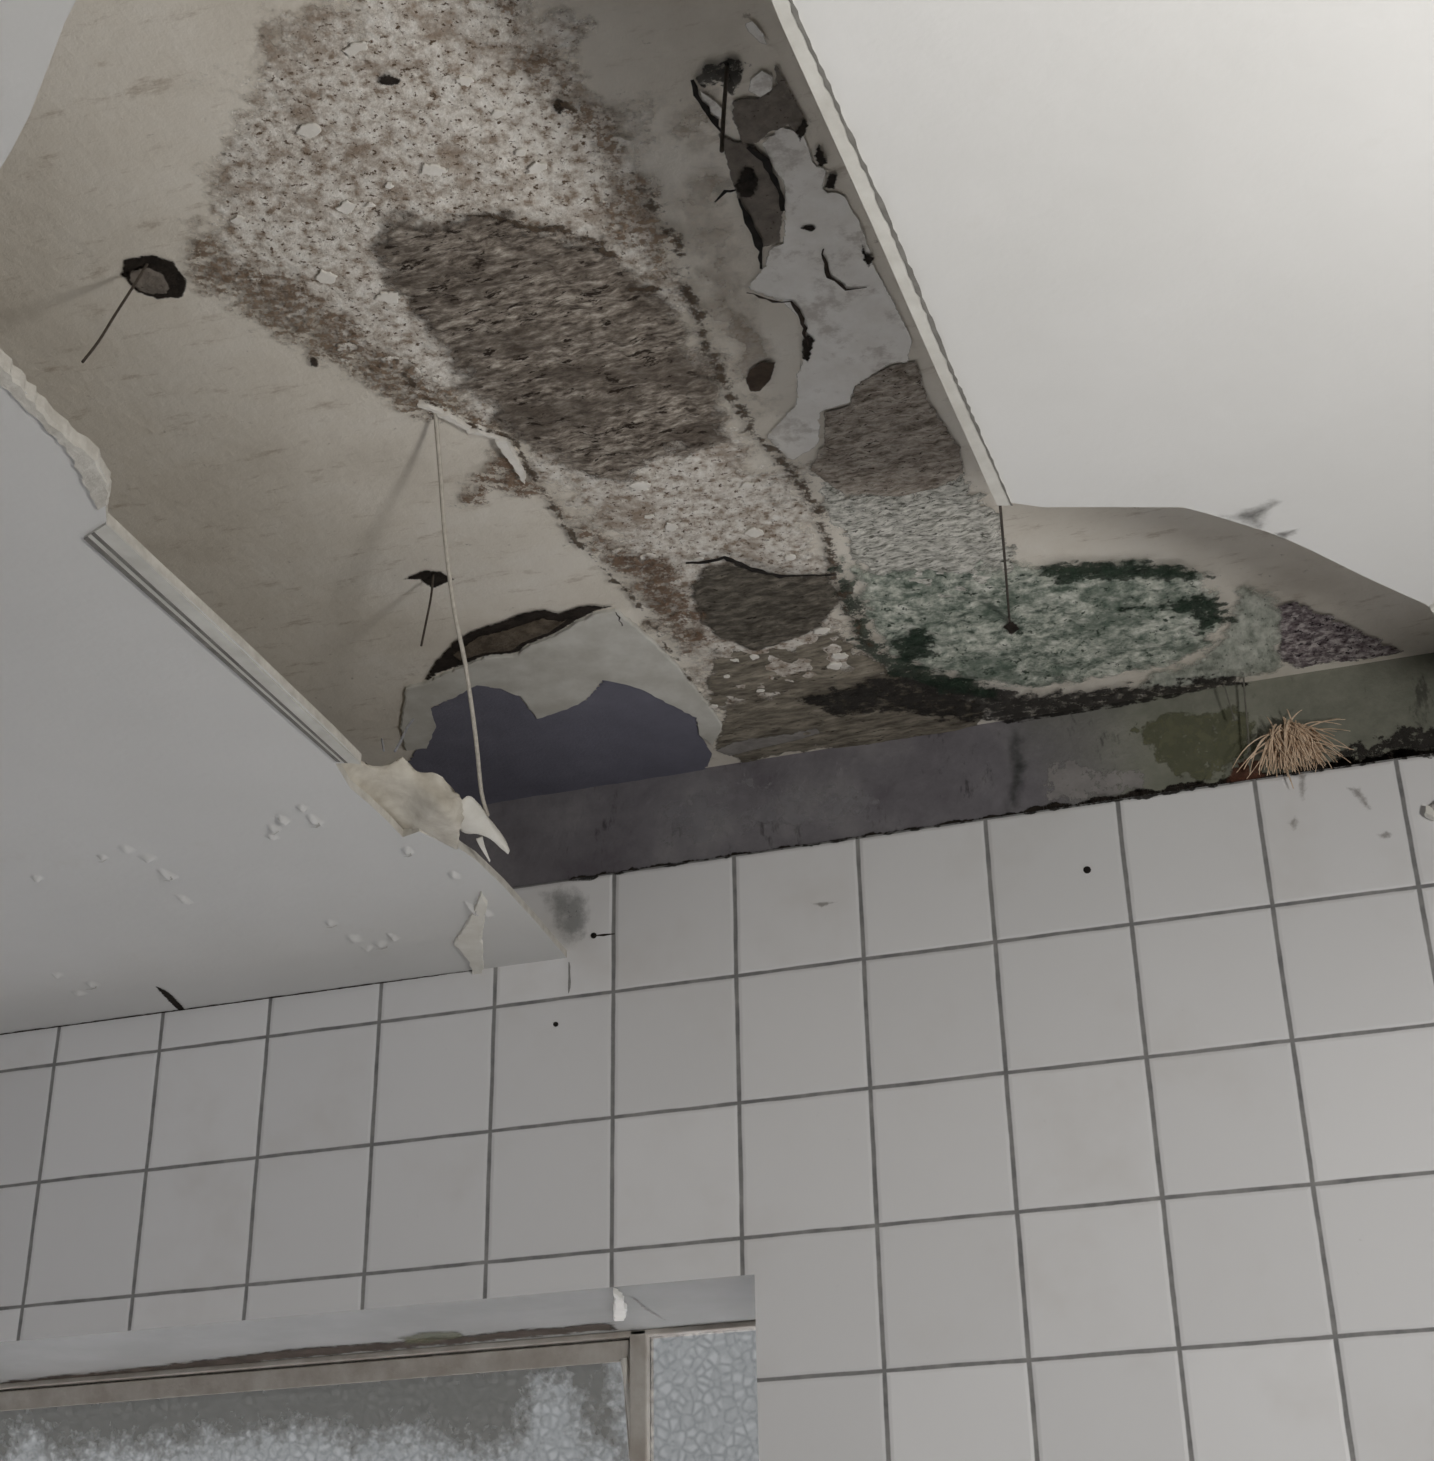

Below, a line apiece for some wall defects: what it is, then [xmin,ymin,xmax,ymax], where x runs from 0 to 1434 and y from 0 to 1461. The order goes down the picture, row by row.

spalling [0,348,112,510]
leakage [187,236,497,431]
peeling [206,0,963,862]
leakage [455,453,1434,881]